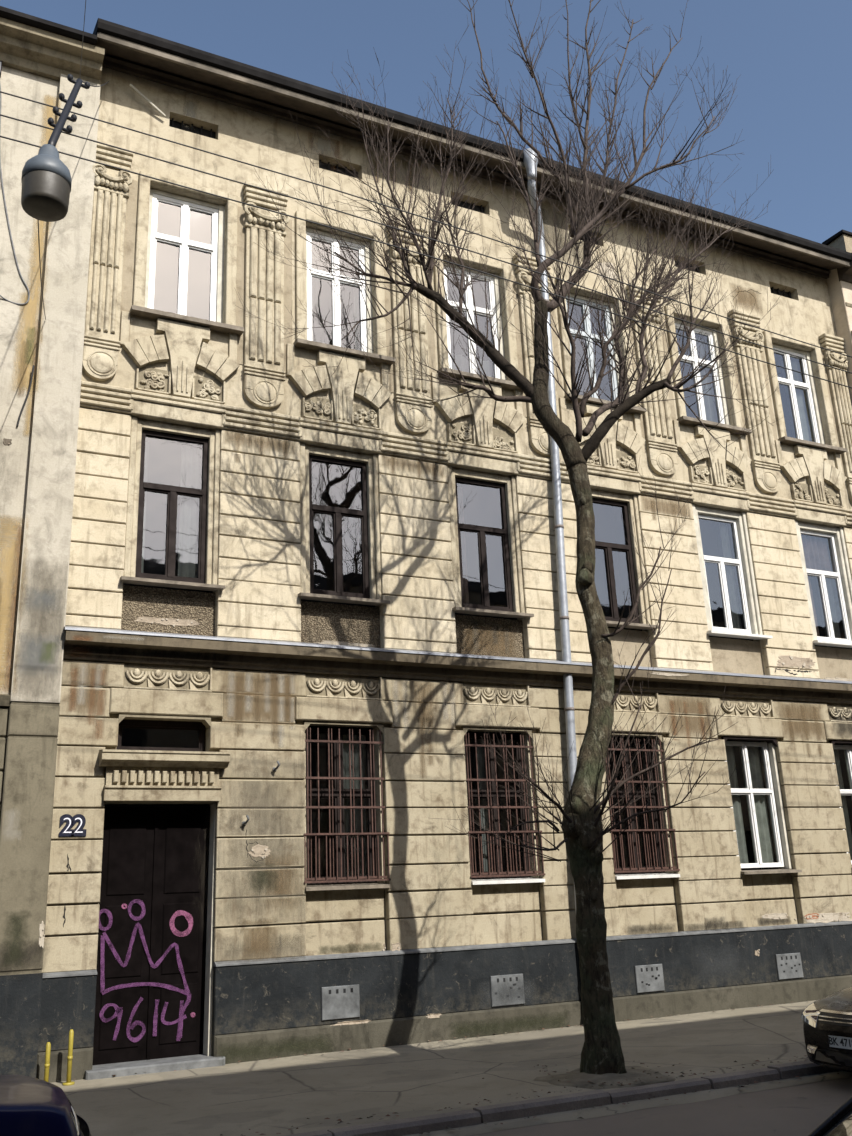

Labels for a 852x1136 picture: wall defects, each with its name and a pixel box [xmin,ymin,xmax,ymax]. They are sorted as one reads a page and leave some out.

leakage [45,97,57,144]
leakage [17,220,48,434]
leakage [0,518,21,687]